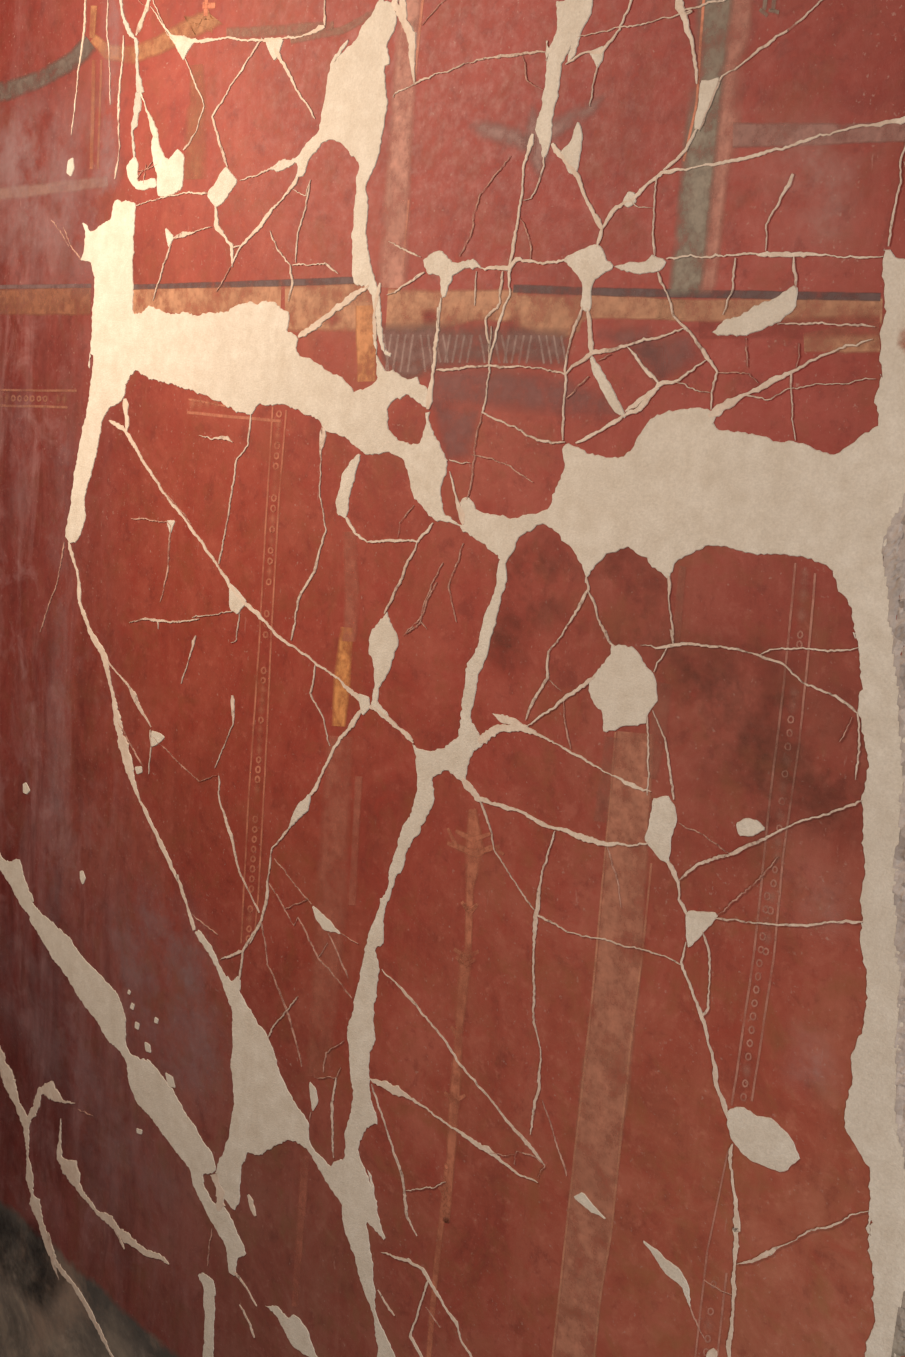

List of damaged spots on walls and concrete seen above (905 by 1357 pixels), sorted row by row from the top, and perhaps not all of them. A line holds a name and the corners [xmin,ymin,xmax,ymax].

crack [126,0,326,301]
crack [288,262,339,302]
crack [387,0,905,500]
spalling [40,542,65,632]
spalling [63,0,484,930]
crack [109,398,464,829]
crack [0,1046,169,1357]
crack [135,695,358,999]
spalling [0,558,651,1357]
crack [378,1252,472,1357]
crack [309,969,567,1183]
spalling [471,250,905,1357]